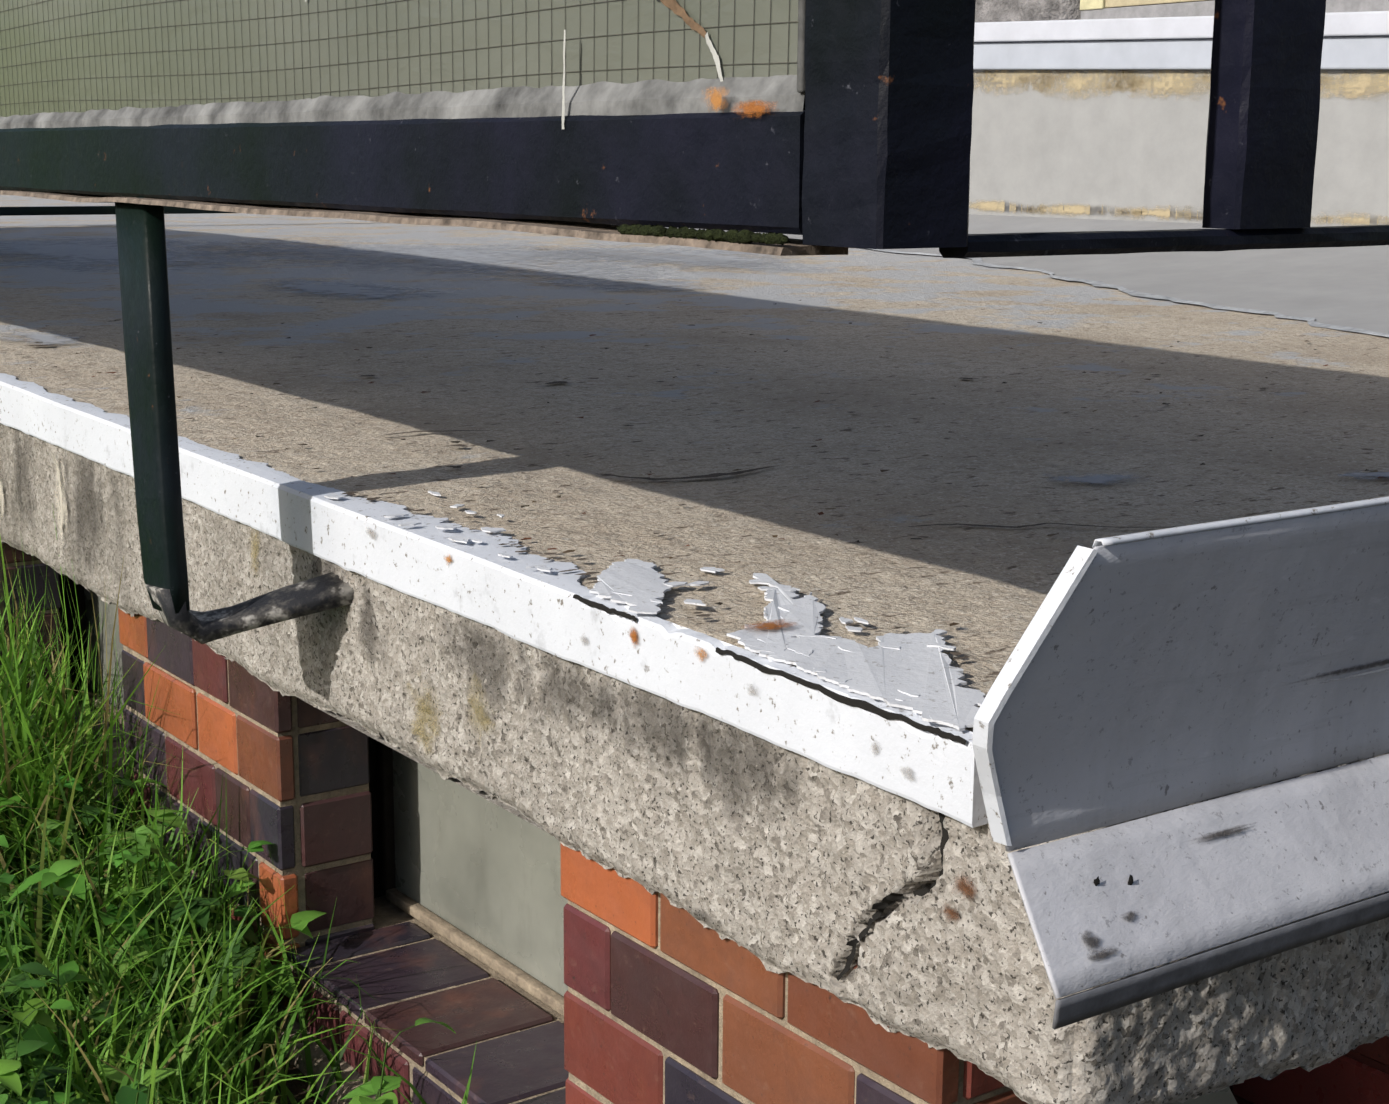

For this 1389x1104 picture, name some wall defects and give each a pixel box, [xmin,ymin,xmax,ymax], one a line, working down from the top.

crack [660,0,723,81]
rust [707,88,773,116]
peeling [727,573,986,732]
crack [836,812,949,981]